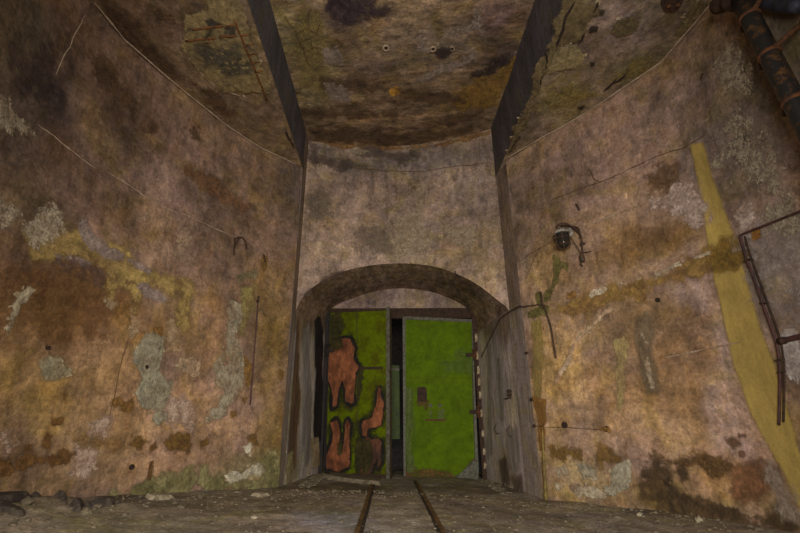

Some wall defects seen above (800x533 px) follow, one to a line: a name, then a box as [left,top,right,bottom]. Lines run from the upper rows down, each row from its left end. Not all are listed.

damp [289,0,516,172]
efflorescence [712,37,756,95]
crack [552,134,706,200]
damp [559,108,800,393]
damp [636,450,800,532]